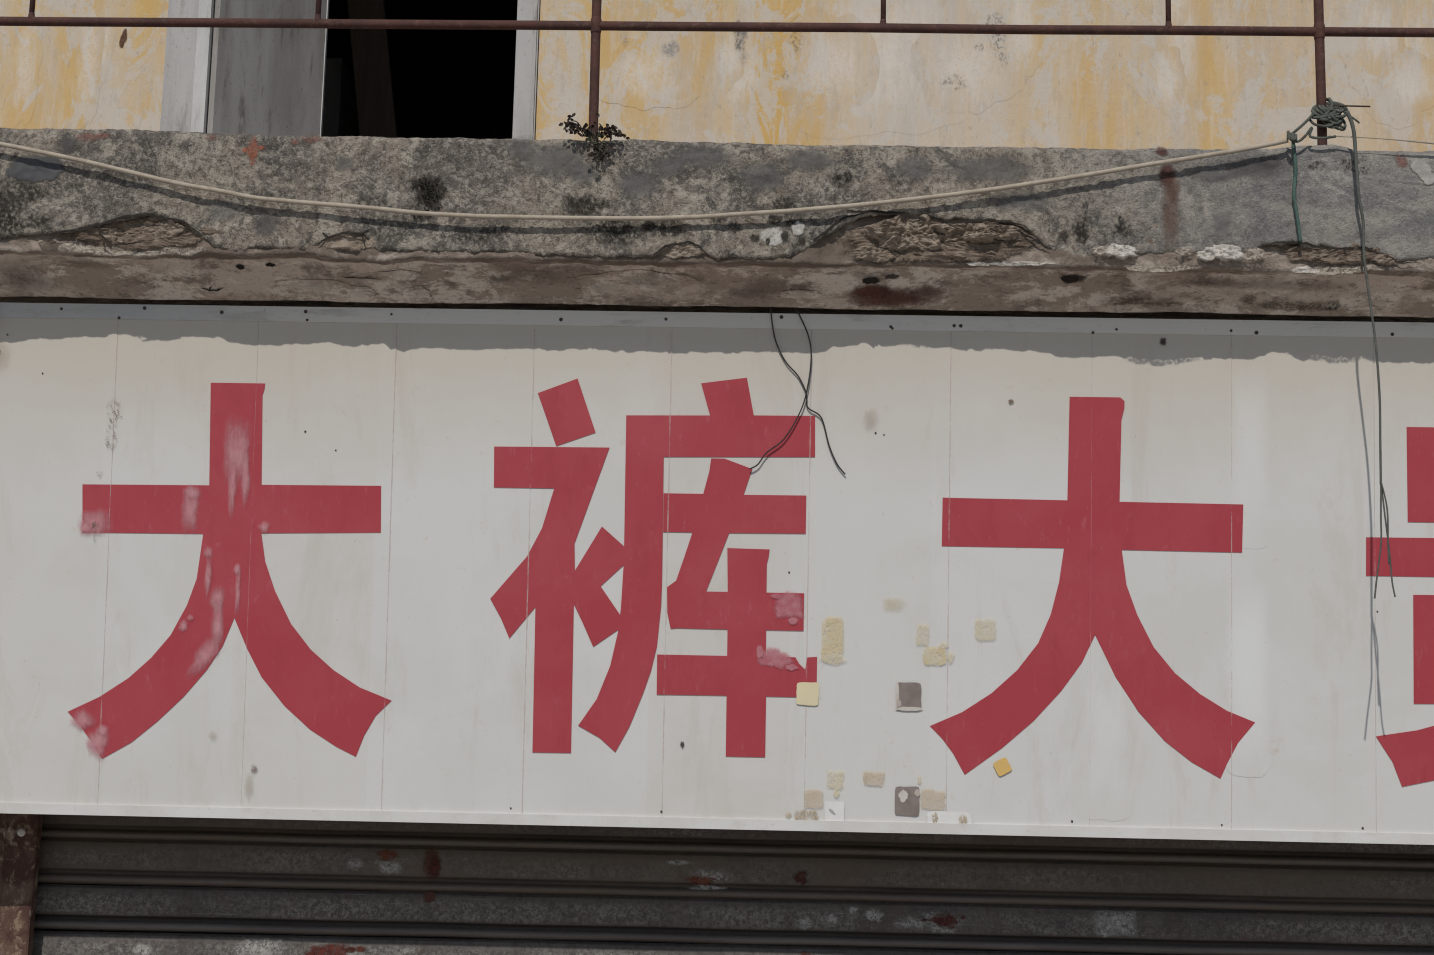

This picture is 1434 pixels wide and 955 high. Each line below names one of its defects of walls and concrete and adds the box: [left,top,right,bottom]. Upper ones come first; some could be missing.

rust [1156,147,1175,187]
spalling [39,216,224,256]
spalling [836,213,1086,284]
rust [305,943,365,955]